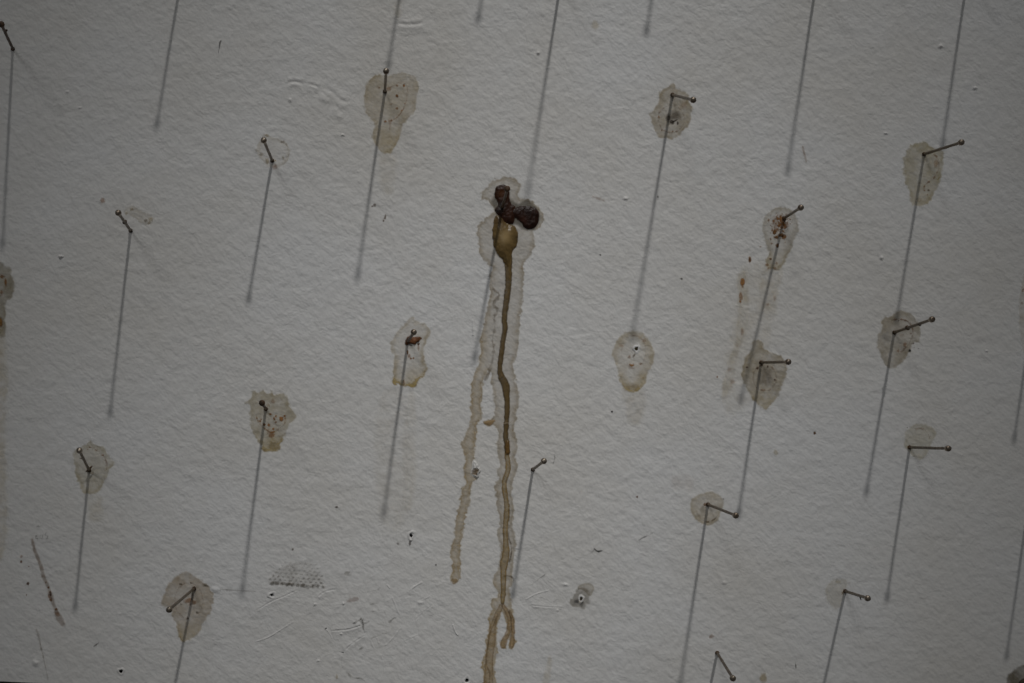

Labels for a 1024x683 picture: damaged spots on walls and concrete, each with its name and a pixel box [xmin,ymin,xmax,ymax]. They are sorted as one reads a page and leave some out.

water stain [451,178,540,683]
corrosion [768,216,787,260]